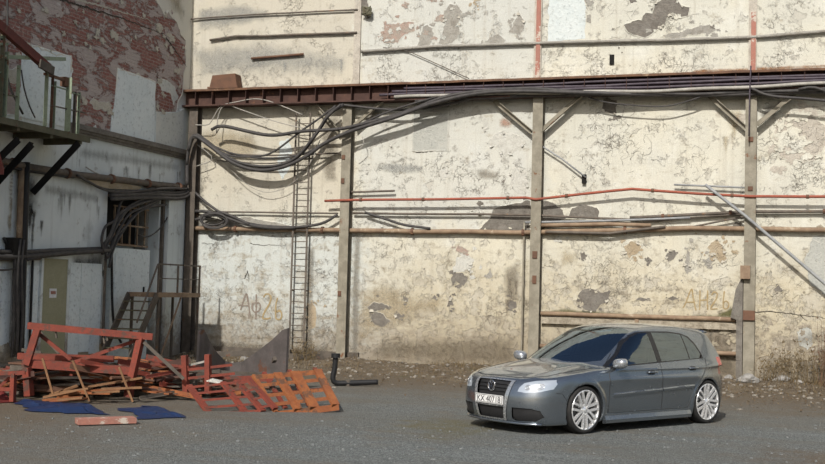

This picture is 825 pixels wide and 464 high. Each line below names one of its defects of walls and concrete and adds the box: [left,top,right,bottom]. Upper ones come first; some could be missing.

flaking render [378,0,481,51]
flaking render [612,0,728,39]
flaking render [0,0,187,131]
flaking render [543,200,600,230]
peeling [431,245,493,312]
flaking render [576,287,612,313]
flaking render [620,239,652,266]
flaking render [665,232,697,281]
flaking render [701,235,739,269]
crack [755,261,825,321]
flaking render [754,314,825,382]